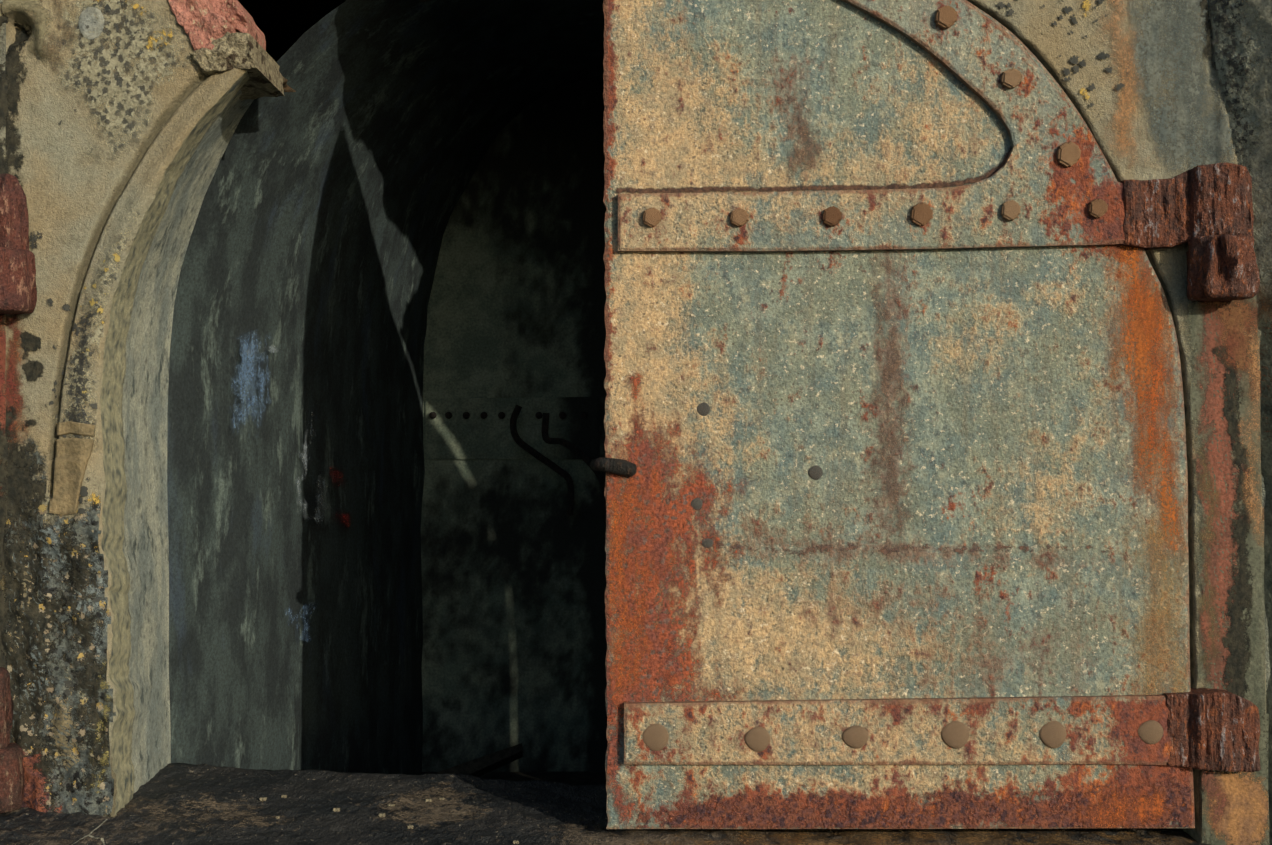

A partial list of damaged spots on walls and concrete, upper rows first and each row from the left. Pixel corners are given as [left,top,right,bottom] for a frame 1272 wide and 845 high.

corrosion [607,246,1272,845]